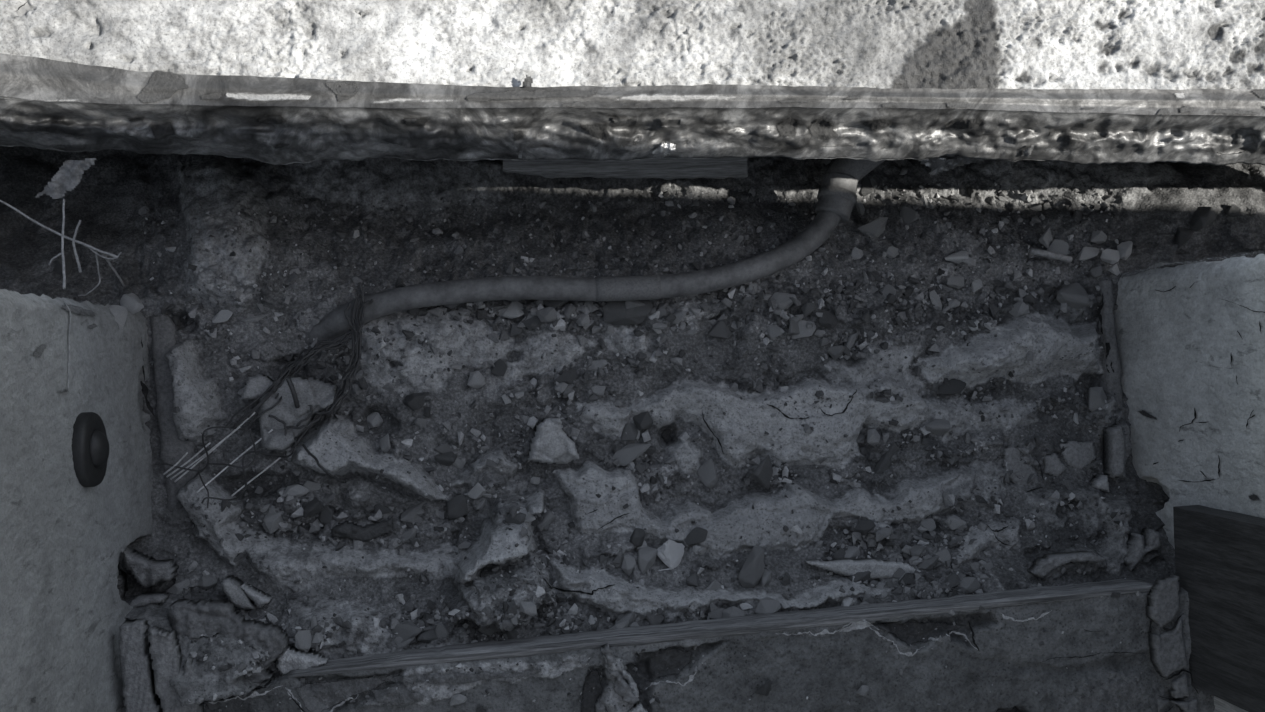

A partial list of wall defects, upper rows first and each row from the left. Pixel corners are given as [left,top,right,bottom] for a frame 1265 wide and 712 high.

spalling [1089,474,1109,492]
spalling [118,545,179,588]
peeling [118,619,541,712]